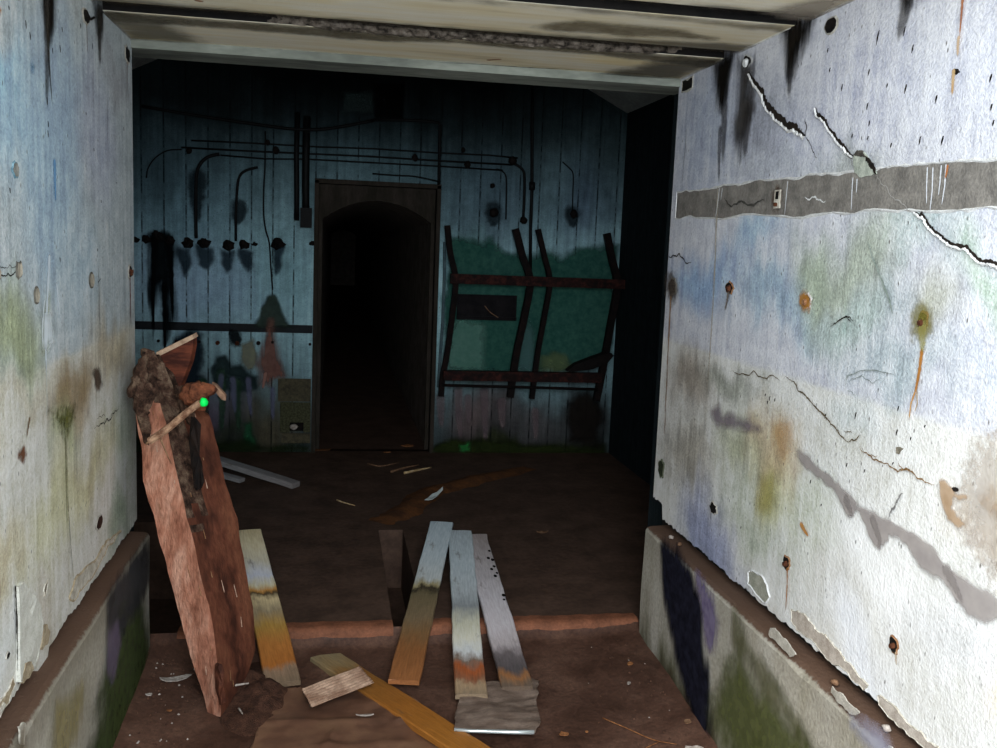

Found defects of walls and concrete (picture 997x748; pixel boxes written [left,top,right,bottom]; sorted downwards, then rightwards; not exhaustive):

crack [747,72,877,178]
peeling [675,156,997,220]
crack [913,211,997,269]
crack [868,243,893,314]
corrosion [909,304,932,418]
crack [733,370,933,517]
flaking render [747,569,771,604]
spalling [769,628,797,657]
flaking render [791,609,868,691]
flaking render [0,676,16,718]
spalling [831,686,860,715]
flaking render [877,695,940,748]